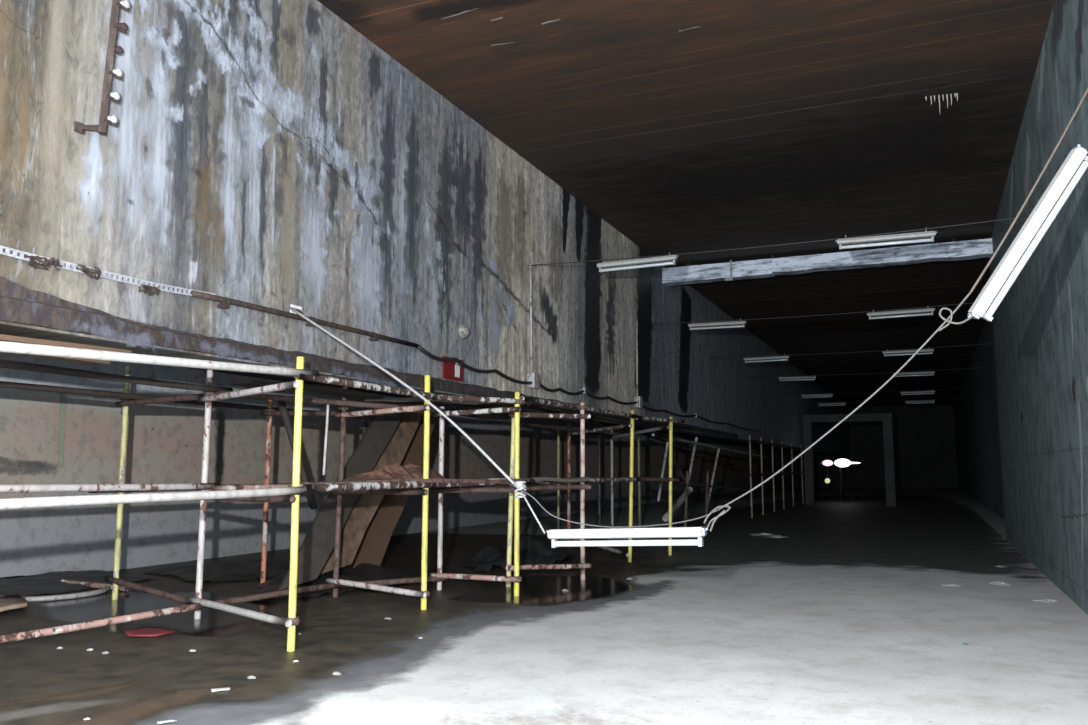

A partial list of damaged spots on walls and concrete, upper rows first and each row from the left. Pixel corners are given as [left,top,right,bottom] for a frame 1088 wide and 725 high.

water stain [46,0,67,165]
water stain [80,131,103,212]
crack [189,4,398,266]
water stain [109,0,528,353]
water stain [75,321,153,347]
water stain [201,341,306,369]
crack [427,200,555,347]
water stain [540,188,615,394]